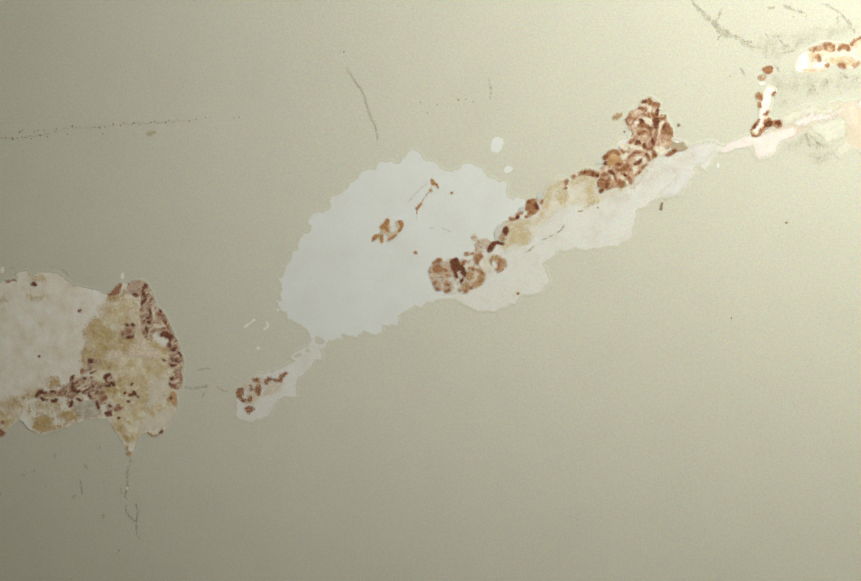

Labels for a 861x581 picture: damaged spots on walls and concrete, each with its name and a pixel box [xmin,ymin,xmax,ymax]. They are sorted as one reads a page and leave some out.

corrosion [758,65,773,86]
flaking render [792,33,861,76]
peeling [234,85,861,425]
flaking render [0,266,186,458]